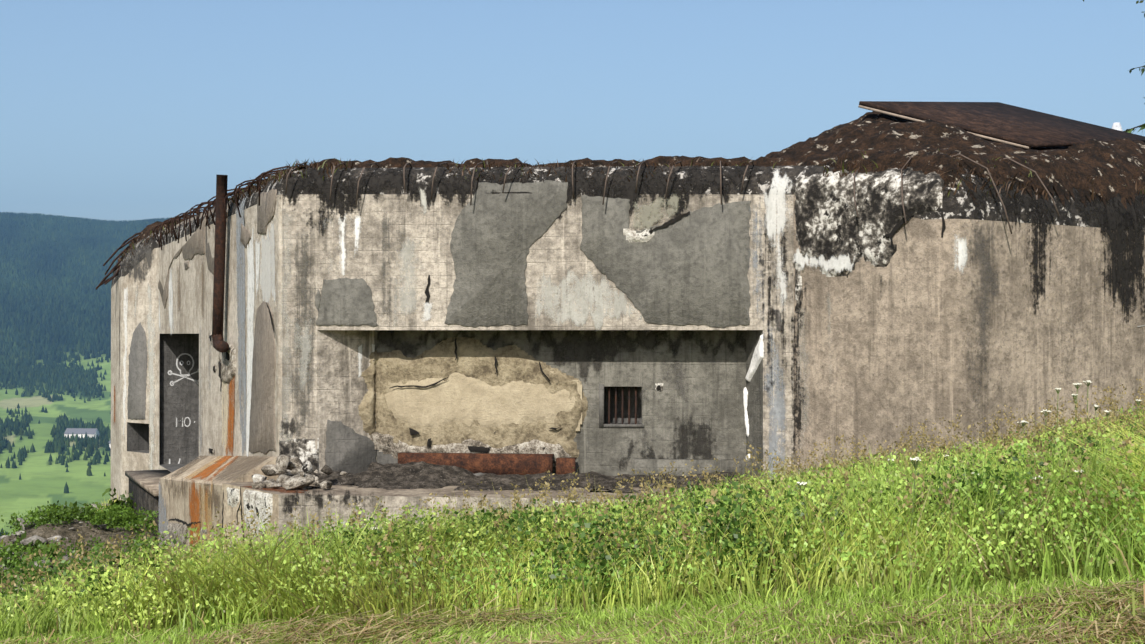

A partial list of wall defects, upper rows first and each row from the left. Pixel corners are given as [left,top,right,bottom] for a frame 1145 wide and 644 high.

flaking render [96,163,307,309]
flaking render [444,160,754,328]
water stain [954,229,998,369]
water stain [956,173,1145,323]
flaking render [249,301,398,477]
spalling [743,333,764,437]
crack [168,486,245,558]
rust [189,380,238,560]
spalling [227,487,273,539]